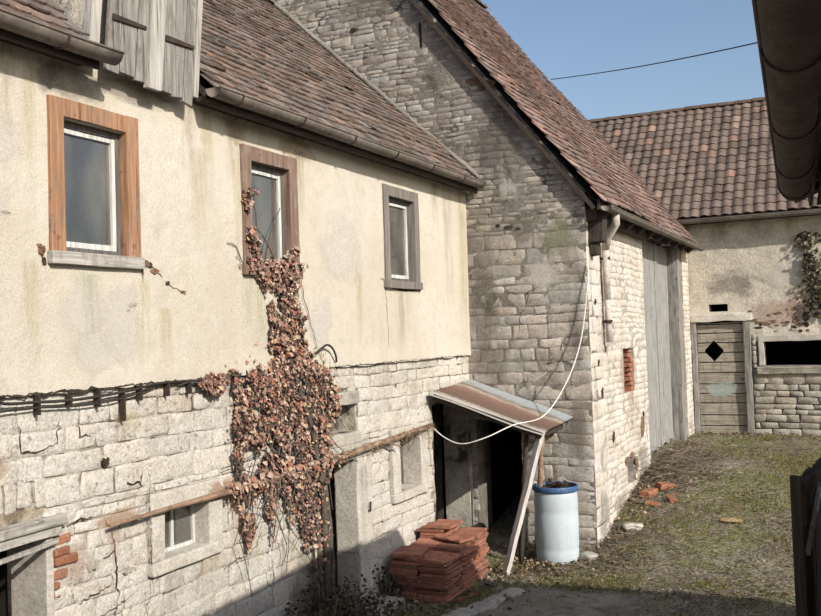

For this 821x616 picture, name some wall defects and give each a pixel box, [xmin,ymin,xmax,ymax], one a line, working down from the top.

spalling [747,301,812,332]
crack [18,418,89,454]
crack [79,474,154,616]